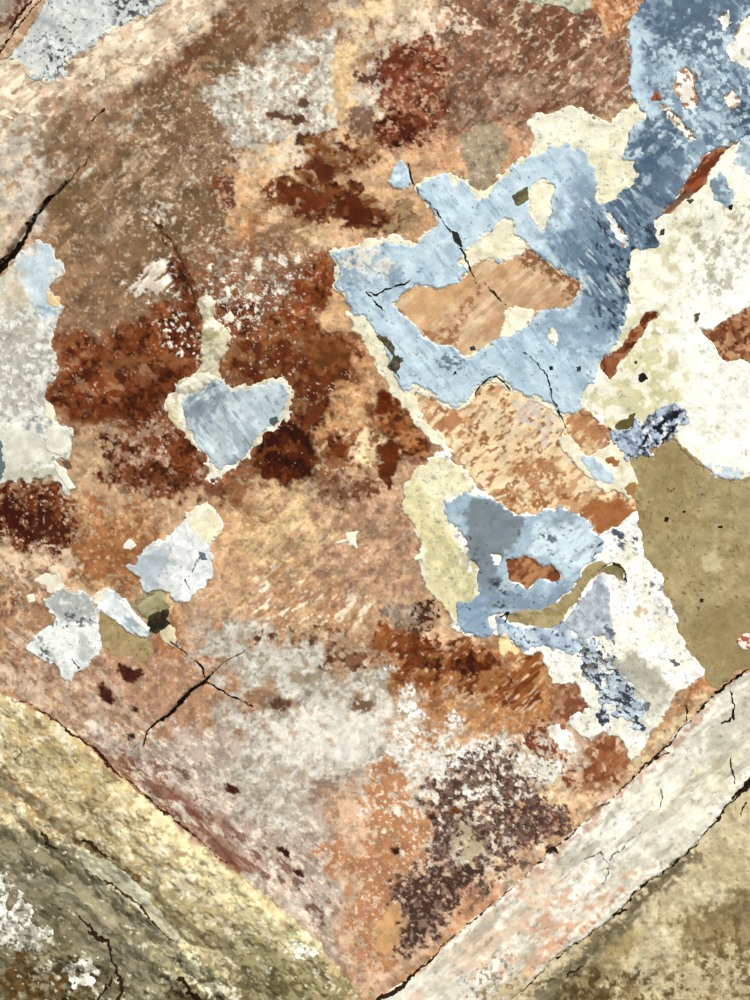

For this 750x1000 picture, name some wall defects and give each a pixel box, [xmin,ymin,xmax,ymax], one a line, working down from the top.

crack [0,156,90,274]
peeling [0,0,211,119]
corrosion [258,27,457,240]
crack [408,163,506,305]
peeling [164,372,294,484]
corrosion [44,242,441,515]
peeling [328,0,750,784]
corrosion [0,478,85,561]
peeling [26,501,224,682]
crack [132,630,263,751]
corrosion [252,593,635,802]
crack [376,668,750,1000]